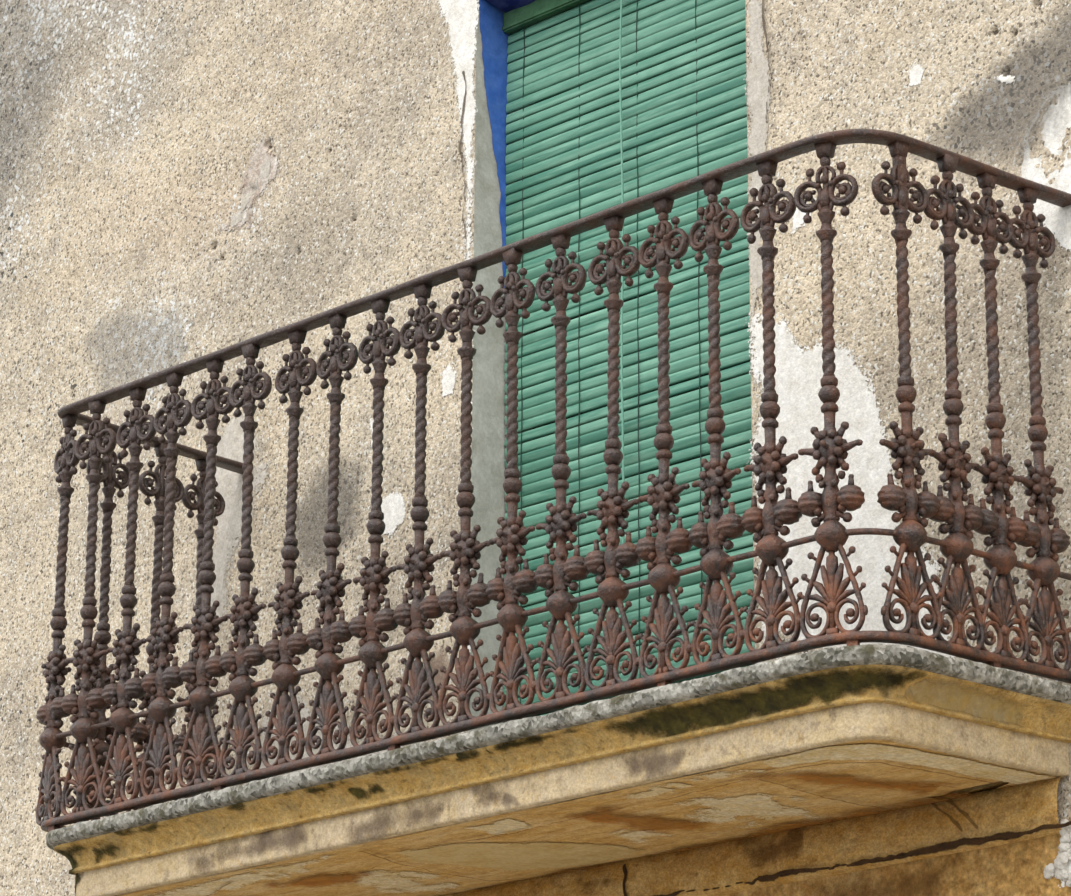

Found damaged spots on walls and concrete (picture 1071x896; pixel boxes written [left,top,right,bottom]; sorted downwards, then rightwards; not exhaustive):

flaking render [994,72,1015,85]
crack [653,762,1071,896]
crack [621,864,629,896]